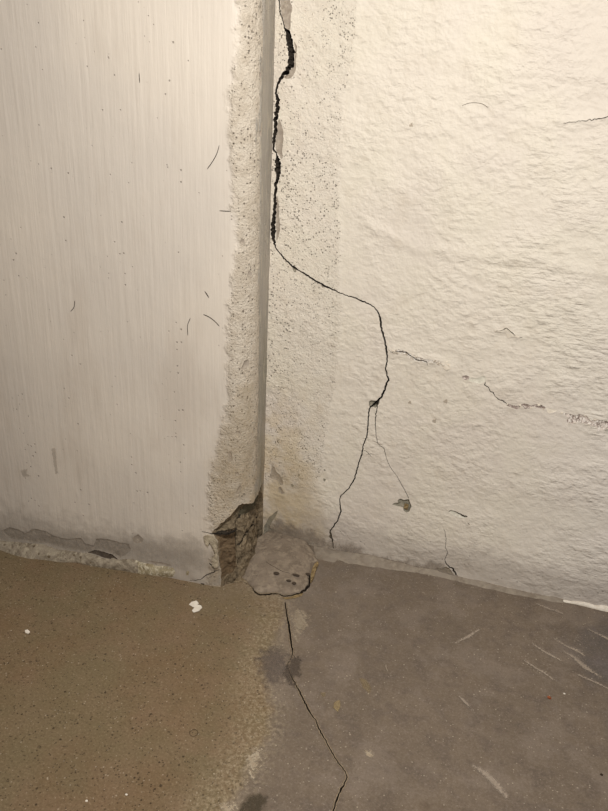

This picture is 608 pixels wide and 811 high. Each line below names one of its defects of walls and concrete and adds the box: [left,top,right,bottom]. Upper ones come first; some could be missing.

crack [270,0,608,549]
peeling [270,466,300,494]
peeling [1,527,143,559]
spalling [202,485,278,587]
crack [190,570,349,811]
water stain [221,794,266,811]